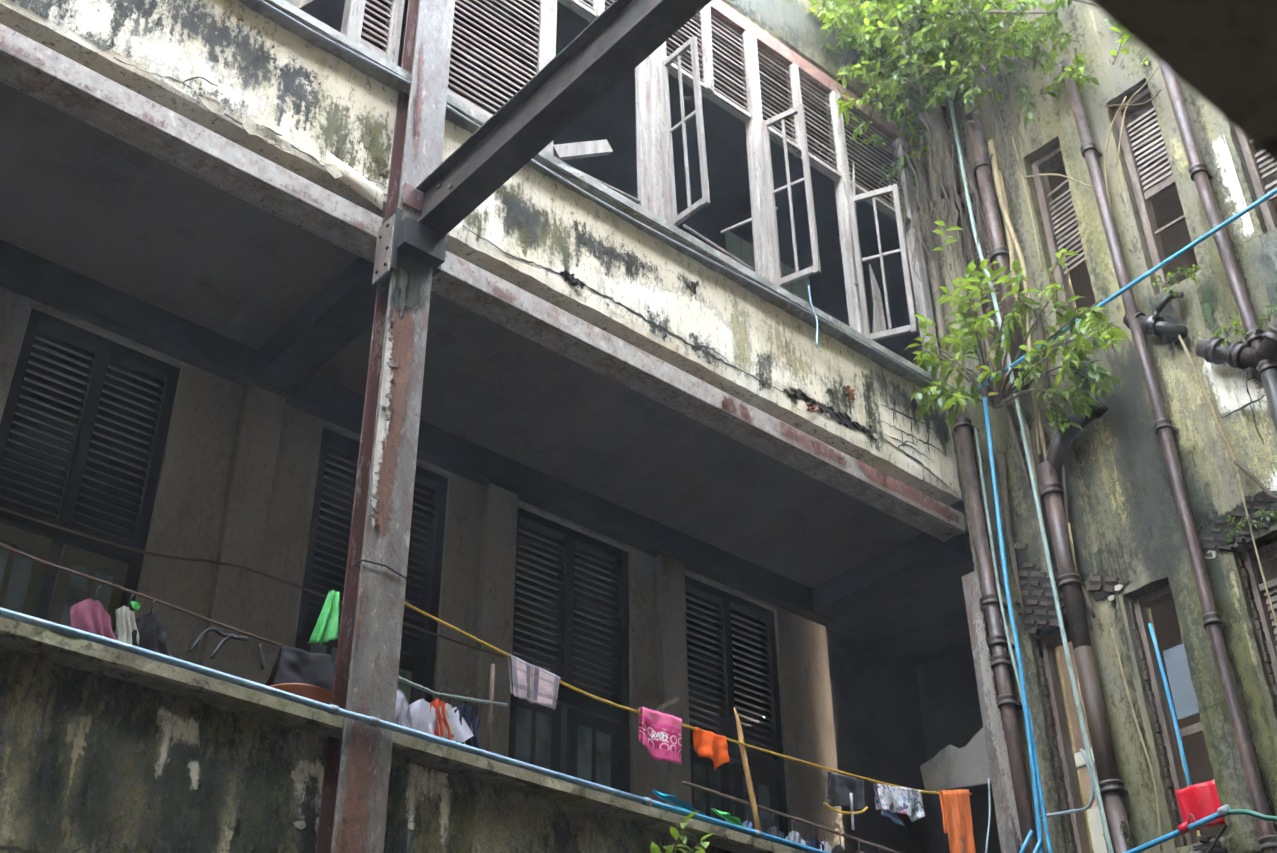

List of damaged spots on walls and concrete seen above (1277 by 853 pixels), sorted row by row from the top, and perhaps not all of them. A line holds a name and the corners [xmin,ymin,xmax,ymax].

peeling [103,27,299,153]
water stain [10,0,394,188]
water stain [463,181,699,301]
crack [462,225,786,393]
peeling [557,268,880,439]
water stain [689,300,951,456]
peeling [1212,131,1254,241]
water stain [974,418,1058,596]
spalling [1013,543,1066,637]
water stain [1061,237,1277,830]
spalling [1198,468,1277,559]
water stain [0,659,322,853]